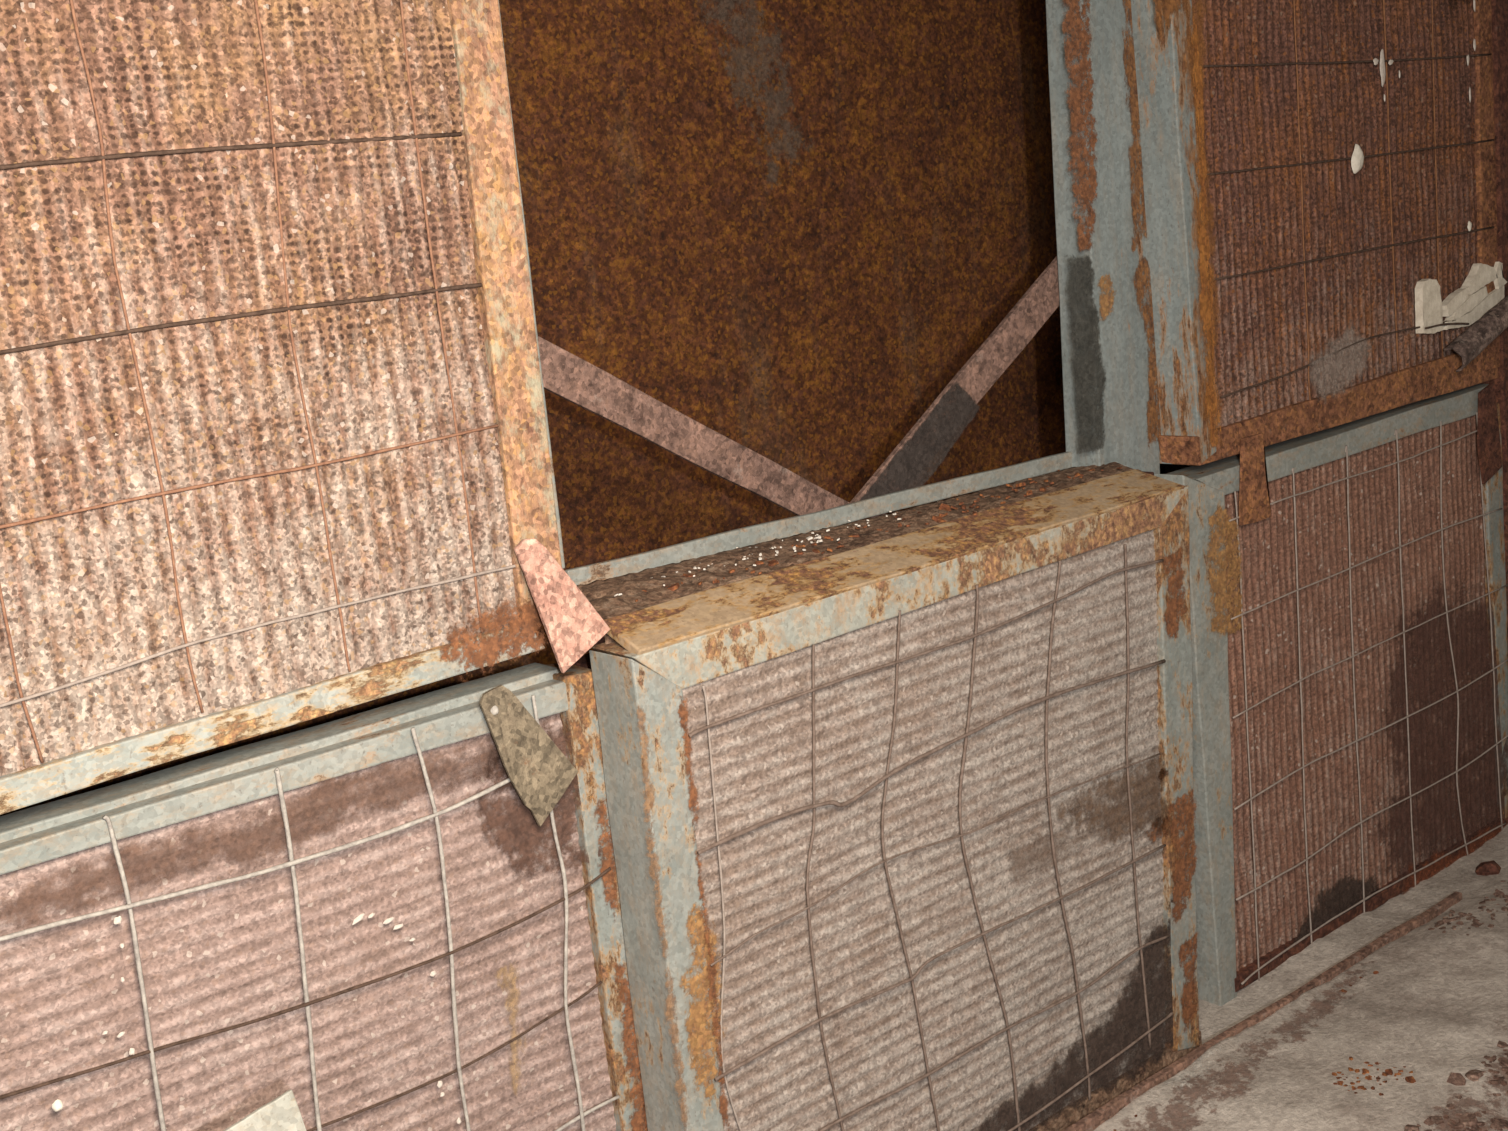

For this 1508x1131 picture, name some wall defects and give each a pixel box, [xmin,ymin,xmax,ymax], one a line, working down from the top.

rust [1062,0,1098,252]
rust [1098,275,1115,320]
rust [1123,0,1161,448]
rust [1154,0,1221,447]
rust [440,599,549,671]
rust [1163,547,1187,639]
rust [1207,507,1243,636]
damp [0,718,604,923]
damp [1294,582,1508,943]
damp [978,899,1175,1131]
damp [1163,1047,1212,1088]
rust [1179,933,1198,1032]